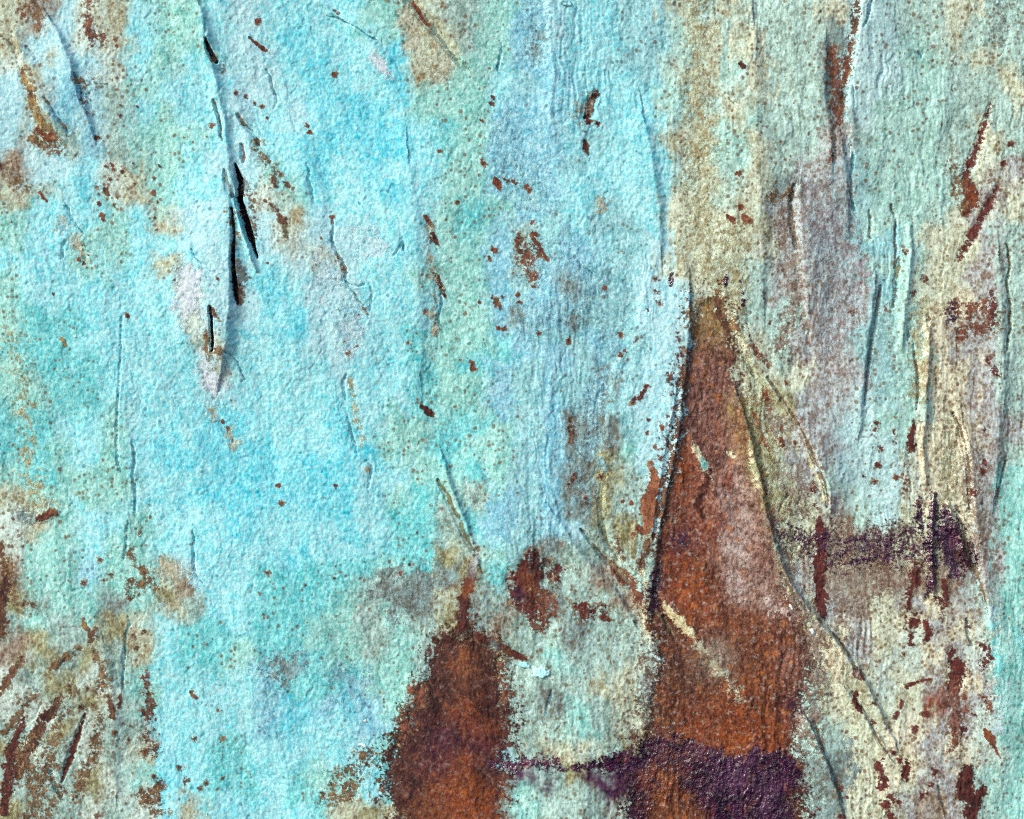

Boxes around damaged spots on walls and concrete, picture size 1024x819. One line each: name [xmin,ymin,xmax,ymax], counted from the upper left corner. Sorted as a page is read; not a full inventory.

crack [204,17,227,75]
rust [824,0,862,165]
crack [193,100,313,374]
rust [486,220,551,288]
rust [944,102,1002,263]
rust [0,539,36,638]
rust [79,528,158,601]
rust [314,272,983,819]
rust [967,458,988,499]
rust [0,617,173,819]
rust [874,640,1008,819]